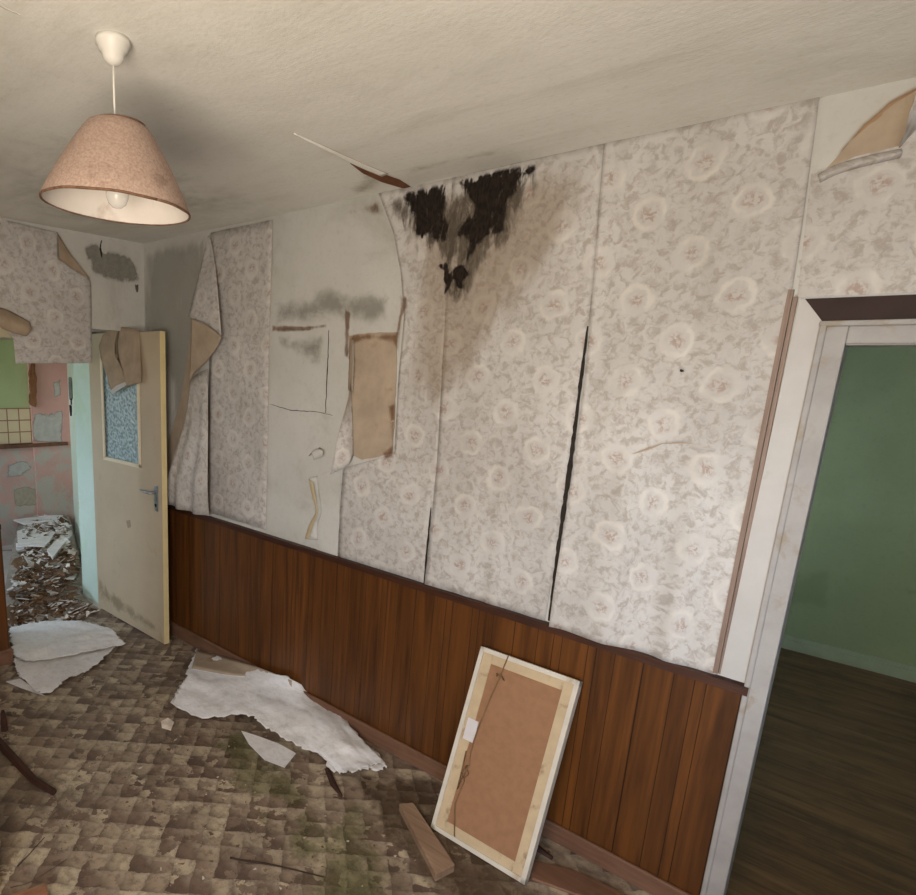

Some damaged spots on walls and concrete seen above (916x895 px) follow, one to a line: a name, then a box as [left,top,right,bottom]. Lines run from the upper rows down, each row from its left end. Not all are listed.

spalling [86,245,138,292]
leakage [393,166,535,299]
peeling [305,469,342,556]